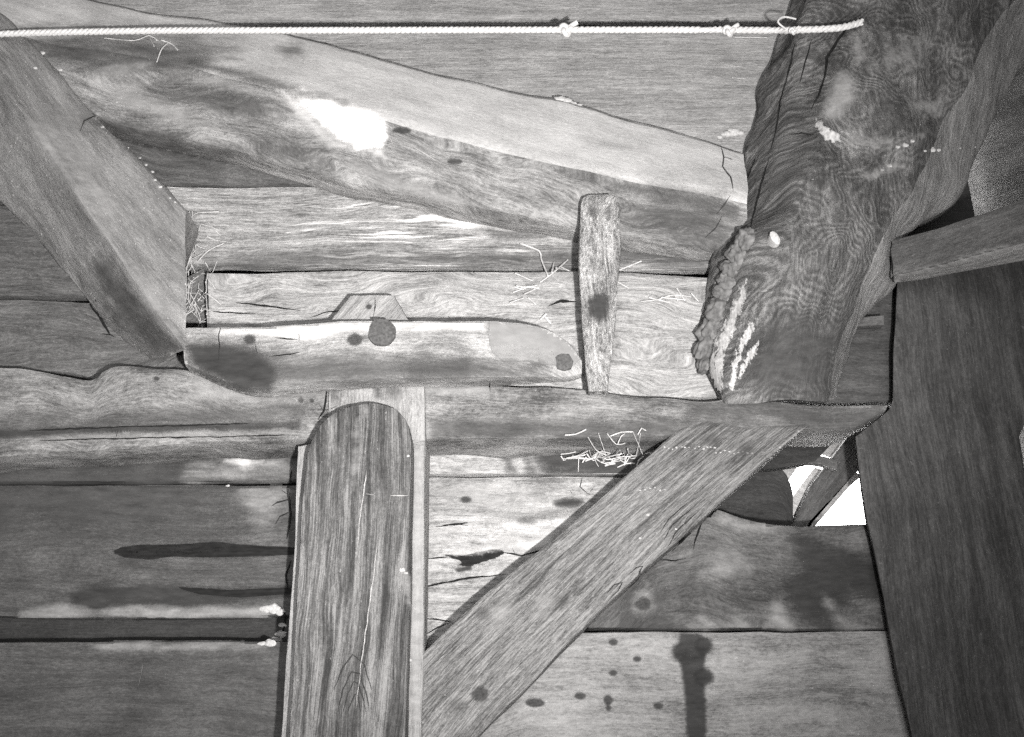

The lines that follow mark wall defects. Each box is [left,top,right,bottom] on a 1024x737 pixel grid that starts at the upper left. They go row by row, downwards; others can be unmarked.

crack [706,30,846,237]
water stain [188,344,512,392]
water stain [42,586,292,617]
water stain [672,634,713,737]